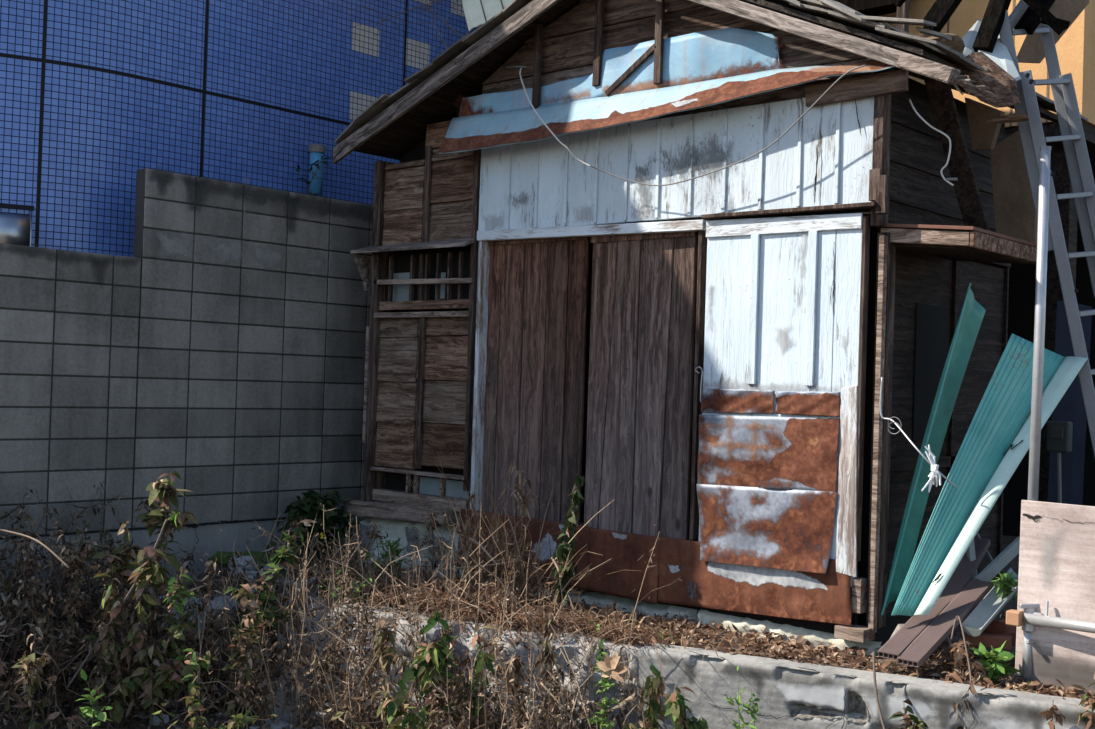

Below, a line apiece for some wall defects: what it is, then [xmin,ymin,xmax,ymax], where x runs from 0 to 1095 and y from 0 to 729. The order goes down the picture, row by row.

rust [438,38,891,153]
water stain [188,182,373,229]
water stain [629,134,731,213]
rust [697,388,841,574]